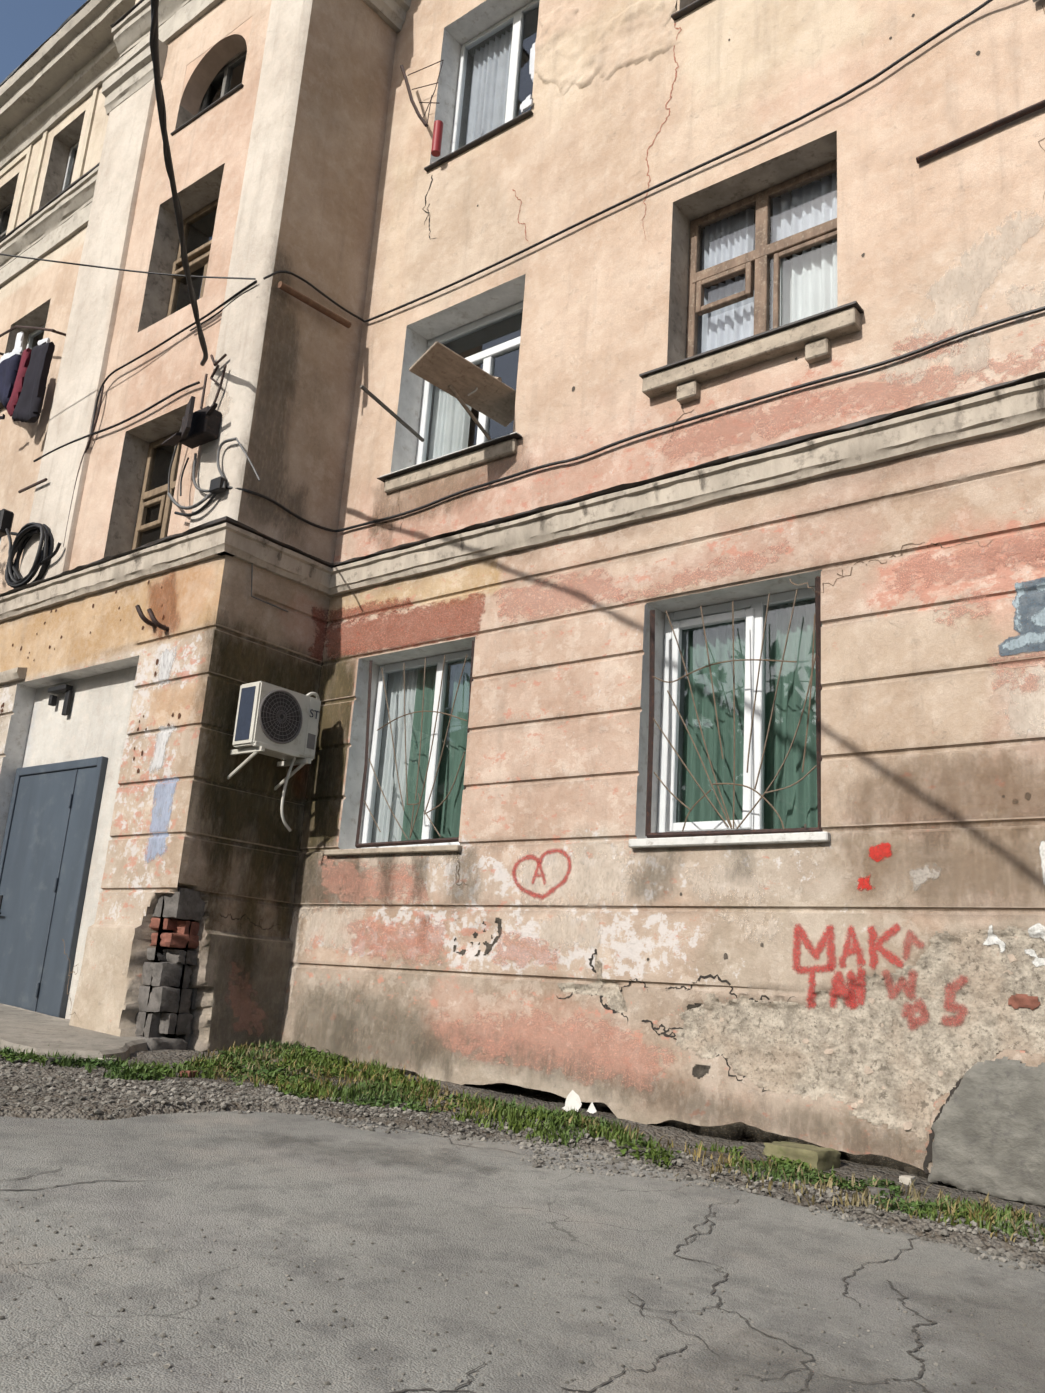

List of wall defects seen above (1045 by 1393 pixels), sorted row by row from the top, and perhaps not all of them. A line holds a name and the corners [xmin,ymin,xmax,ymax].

crack [642,23,682,242]
peeling [309,593,485,663]
damp [193,627,354,992]
spalling [453,917,502,956]
crack [557,949,794,1040]
crack [716,1054,767,1092]
spalling [675,926,1045,1144]